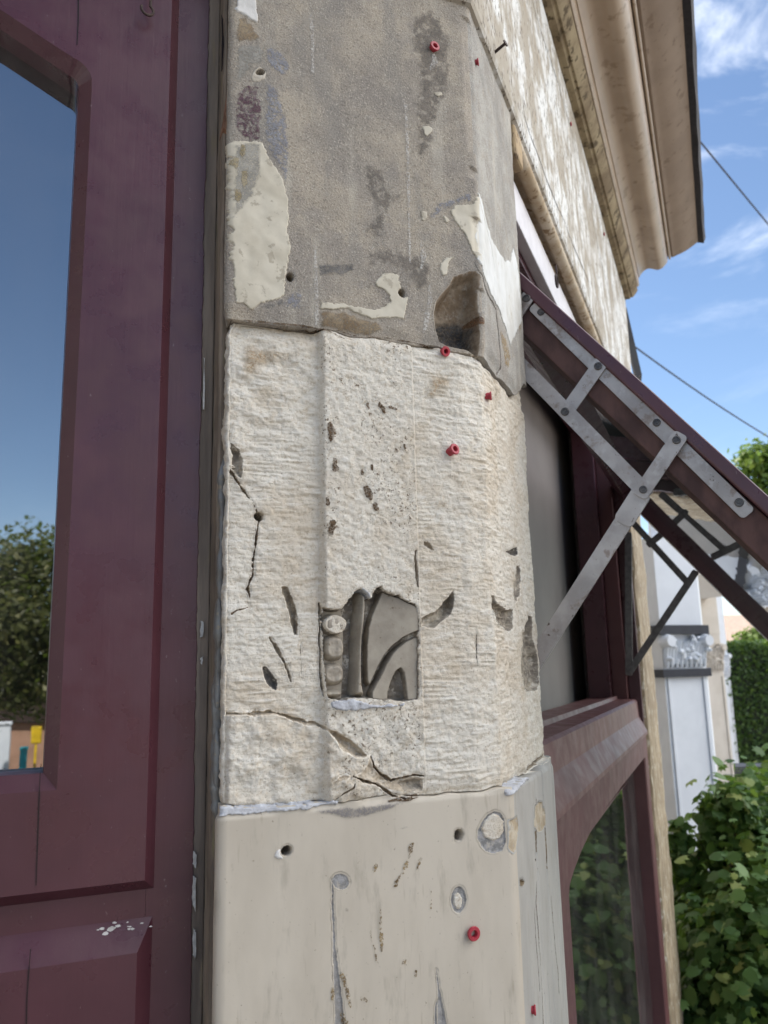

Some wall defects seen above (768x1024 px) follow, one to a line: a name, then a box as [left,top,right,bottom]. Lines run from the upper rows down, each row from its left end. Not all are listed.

damp [415,14,448,154]
peeling [320,273,408,320]
spalling [433,257,483,359]
crack [227,464,261,617]
spalling [491,546,540,693]